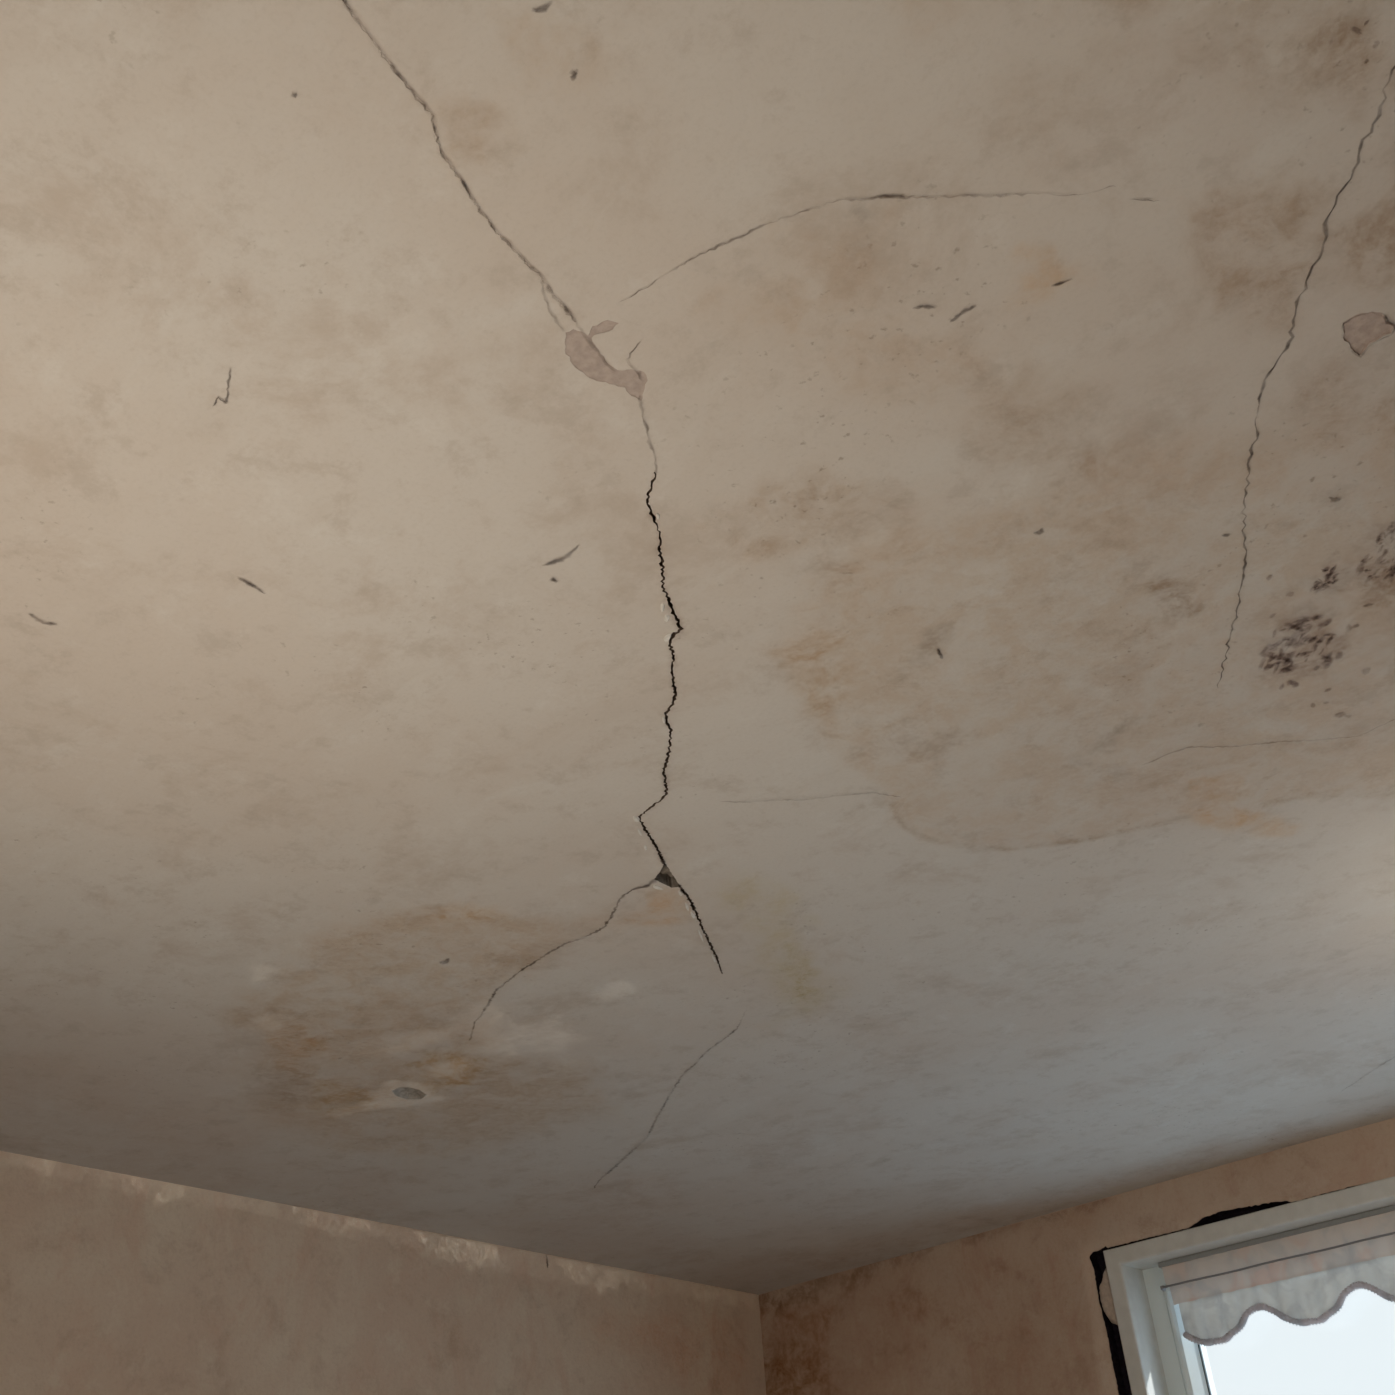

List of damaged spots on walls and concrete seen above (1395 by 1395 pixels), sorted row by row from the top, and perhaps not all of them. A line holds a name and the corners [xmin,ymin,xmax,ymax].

crack [1325,144,1362,221]
spalling [565,320,648,400]
spalling [1343,311,1395,356]
crack [1217,529,1247,685]
crack [627,472,723,974]